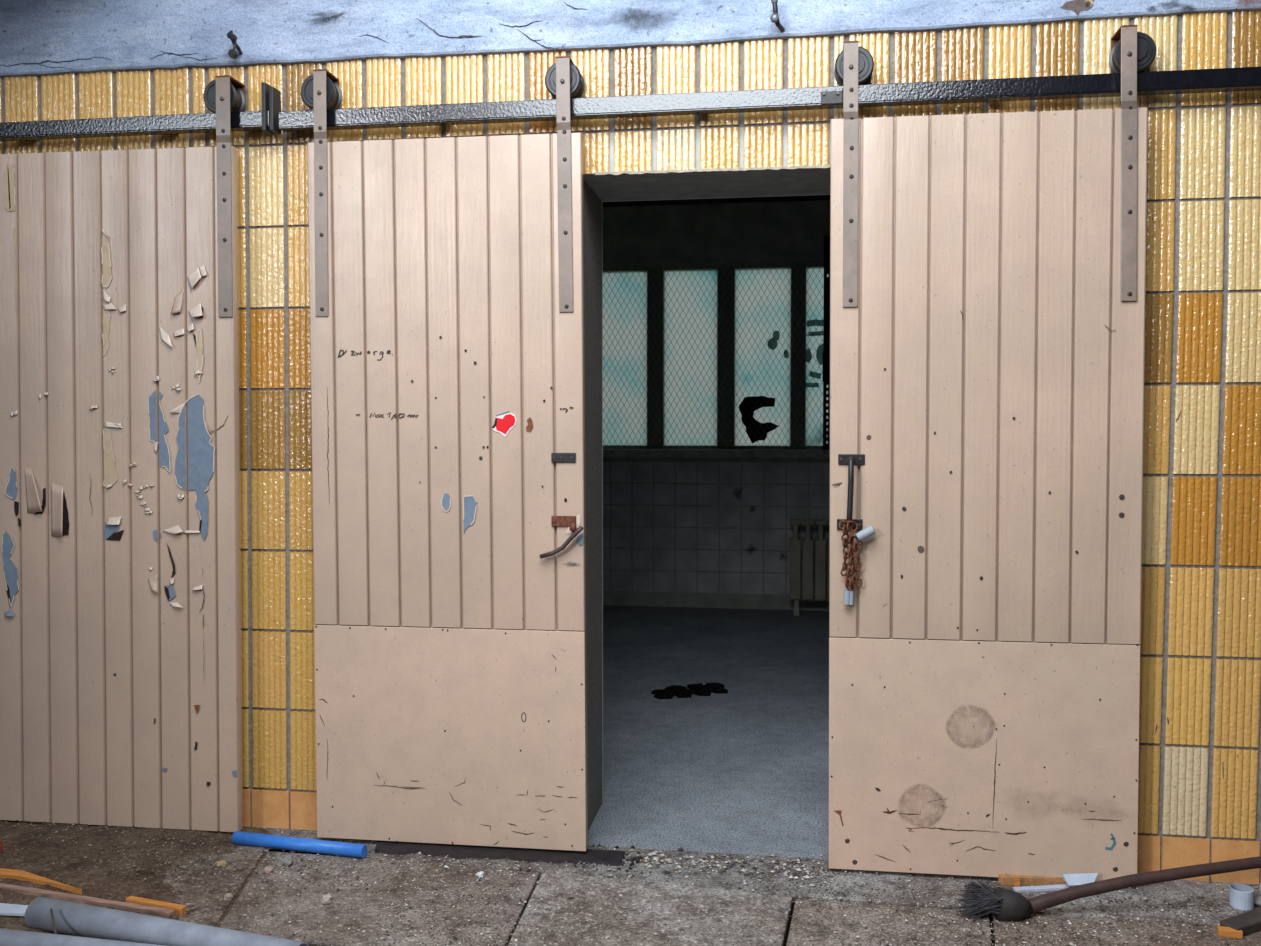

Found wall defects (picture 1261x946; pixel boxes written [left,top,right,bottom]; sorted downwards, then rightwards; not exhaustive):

crack [418,2,587,49]
crack [4,57,112,69]
crack [151,51,217,61]
peeling [101,228,126,356]
peeling [147,265,215,608]
peeling [441,493,477,533]
peeling [1,466,69,617]